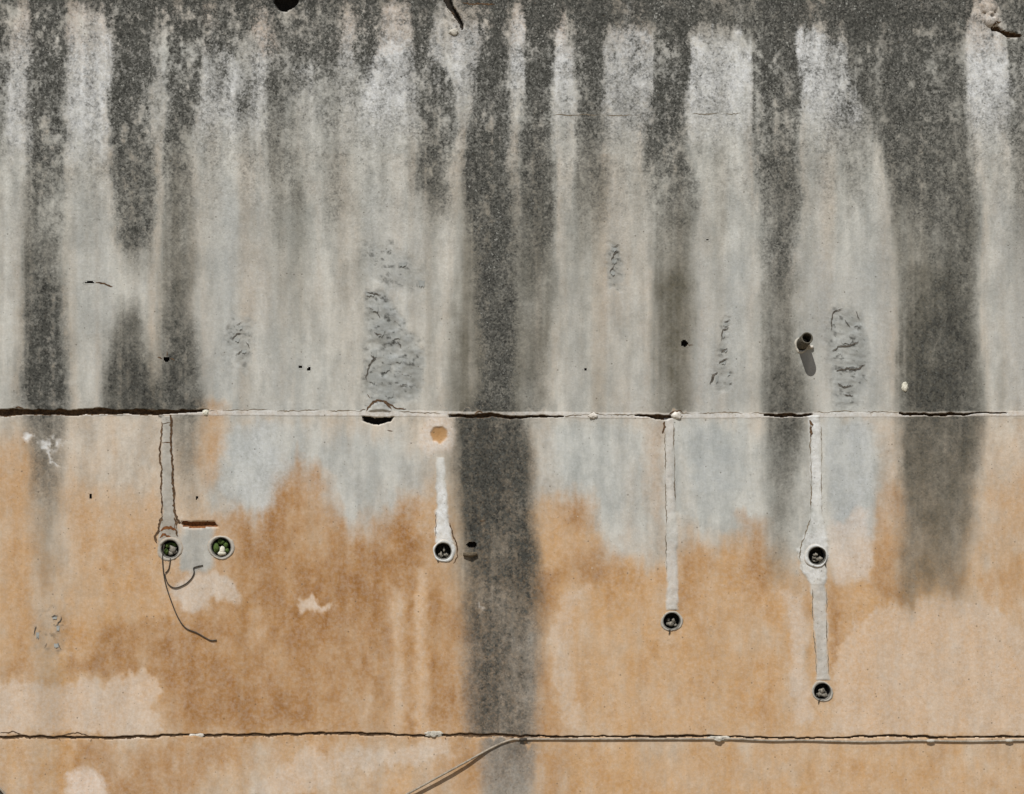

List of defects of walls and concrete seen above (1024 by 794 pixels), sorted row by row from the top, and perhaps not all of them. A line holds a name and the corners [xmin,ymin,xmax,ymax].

crack [443,0,495,30]
corrosion [0,426,43,684]
corrosion [193,394,233,495]
corrosion [57,440,487,794]
peeling [356,238,429,431]
leakage [437,417,542,794]
leakage [0,0,1024,625]
crack [0,731,1024,740]
corrosion [531,417,1024,794]
peeling [823,302,871,412]